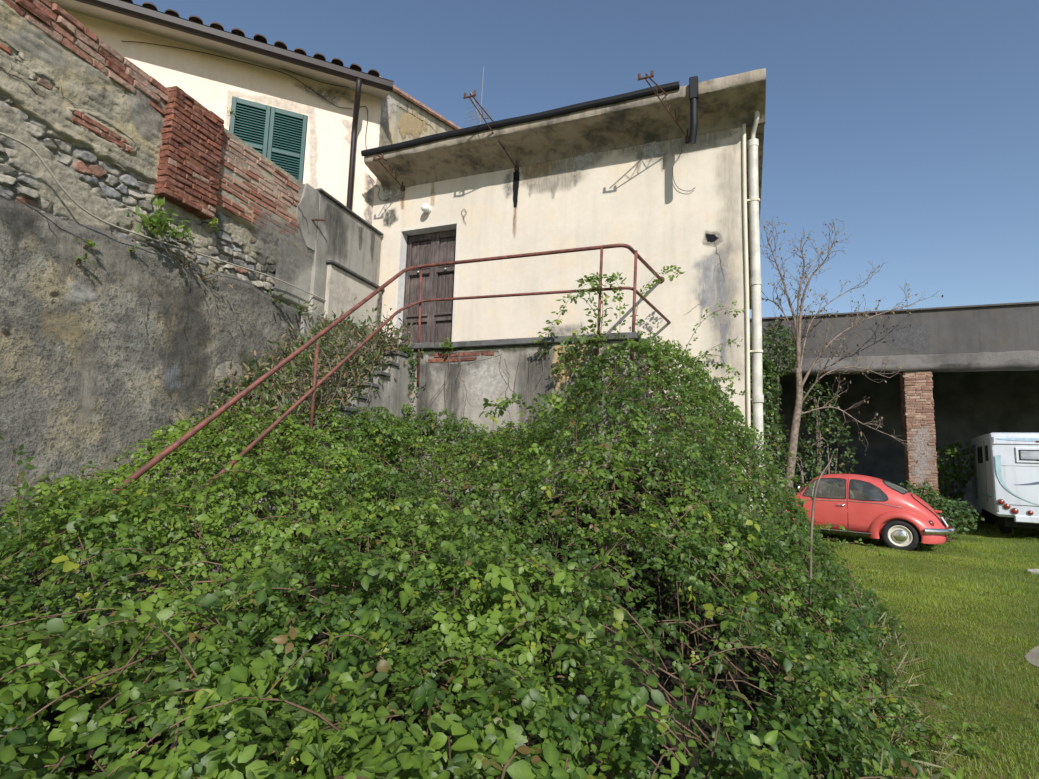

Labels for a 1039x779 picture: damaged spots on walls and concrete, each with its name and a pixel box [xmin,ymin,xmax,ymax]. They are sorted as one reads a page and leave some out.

flaking render [0,33,60,96]
flaking render [66,107,141,154]
flaking render [382,96,428,139]
water stain [622,129,732,169]
water stain [523,152,604,196]
spalling [704,232,721,246]
water stain [697,249,730,362]
flaking render [425,350,503,366]